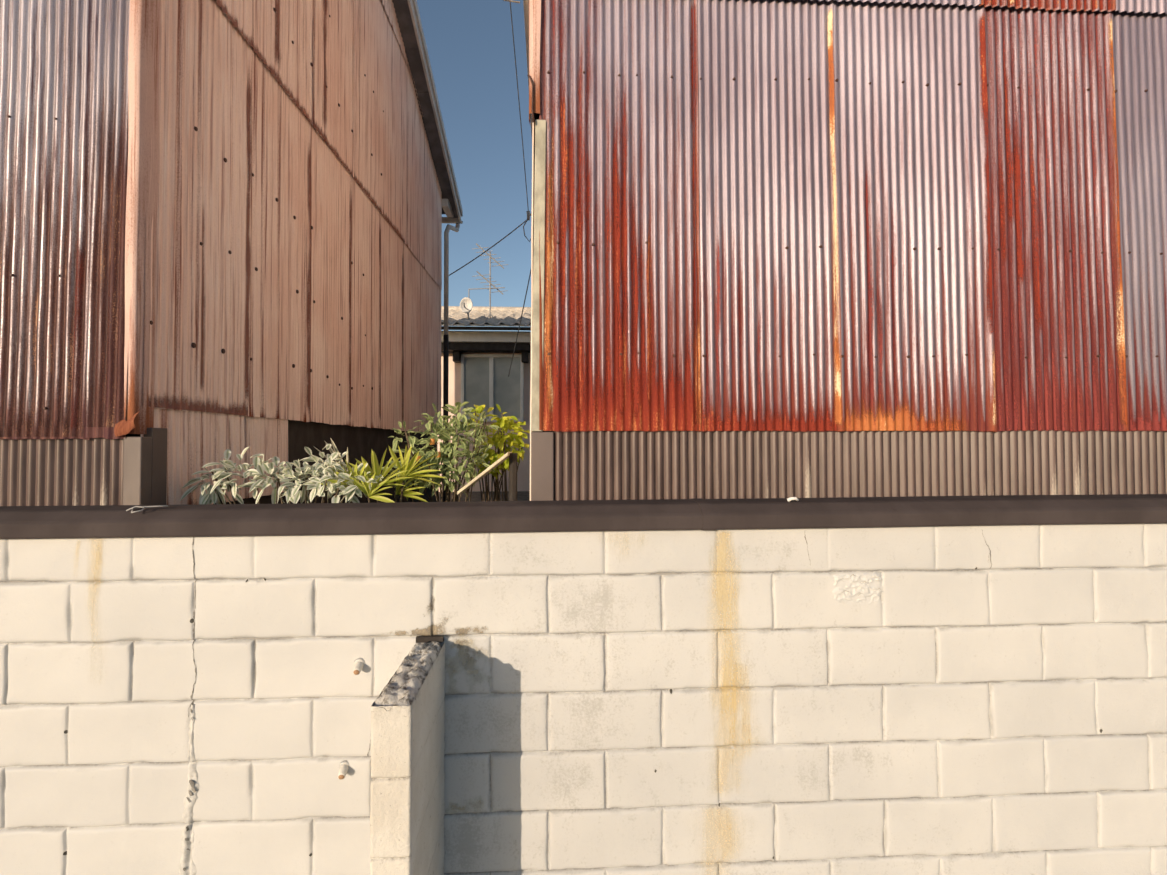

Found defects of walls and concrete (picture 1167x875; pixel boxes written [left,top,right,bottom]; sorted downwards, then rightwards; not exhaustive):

rust [0,102,128,437]
rust [542,0,965,431]
rust [979,0,1167,431]
crack [188,537,197,717]
peeling [832,572,885,606]